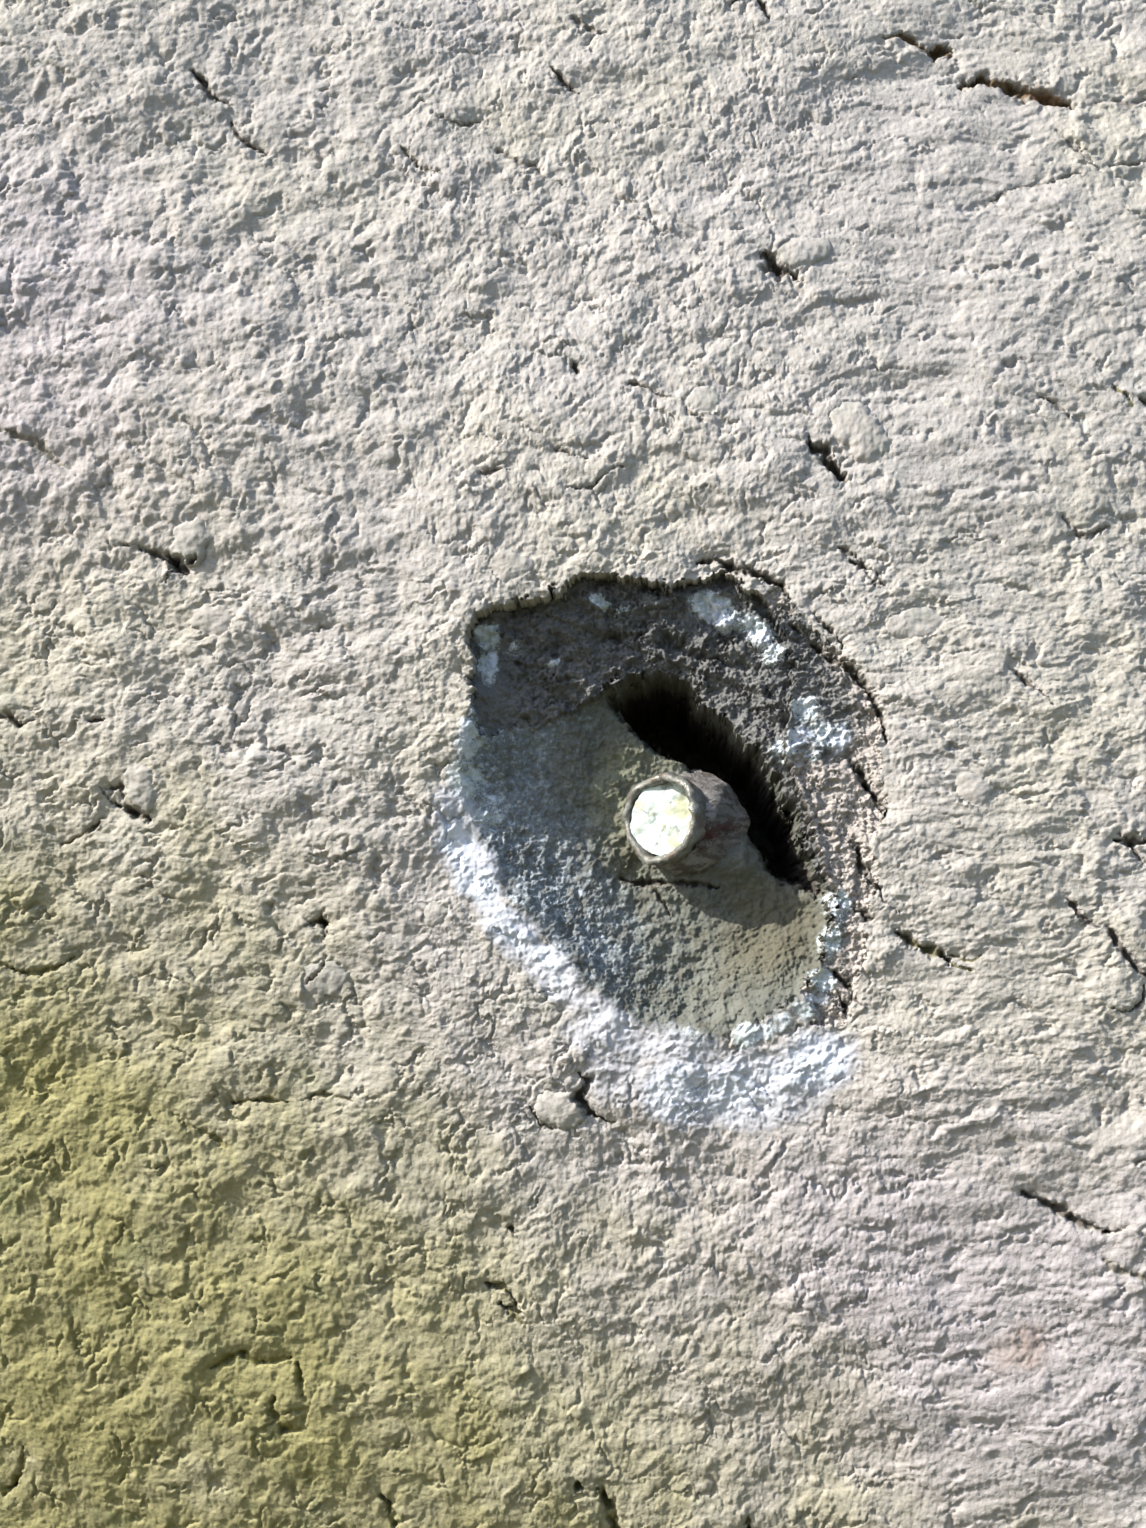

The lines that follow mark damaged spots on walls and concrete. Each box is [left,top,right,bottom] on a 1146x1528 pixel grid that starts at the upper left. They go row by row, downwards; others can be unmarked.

crack [728,0,772,21]
crack [983,128,1146,209]
spalling [838,546,887,588]
spalling [450,572,889,1041]
crack [1065,896,1146,1014]
crack [1019,1189,1146,1285]